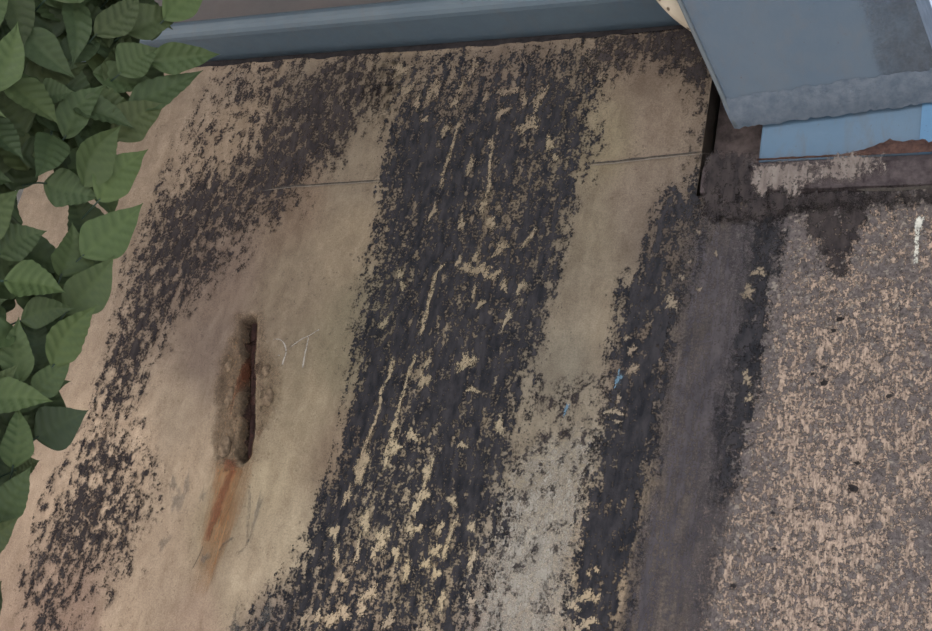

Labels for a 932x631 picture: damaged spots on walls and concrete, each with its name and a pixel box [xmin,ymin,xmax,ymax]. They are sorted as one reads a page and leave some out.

rust [203,466,241,577]
spalling [214,318,274,468]
damp [17,28,711,631]
damp [555,149,932,631]